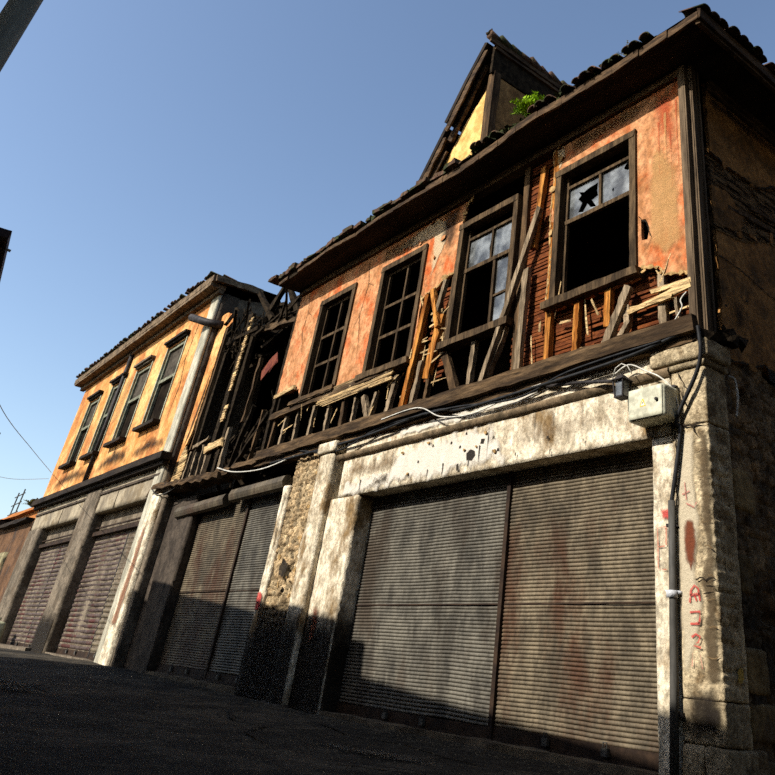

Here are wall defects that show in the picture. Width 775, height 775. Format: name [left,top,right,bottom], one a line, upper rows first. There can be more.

spalling [268,154,473,286]
flaking render [640,264,687,276]